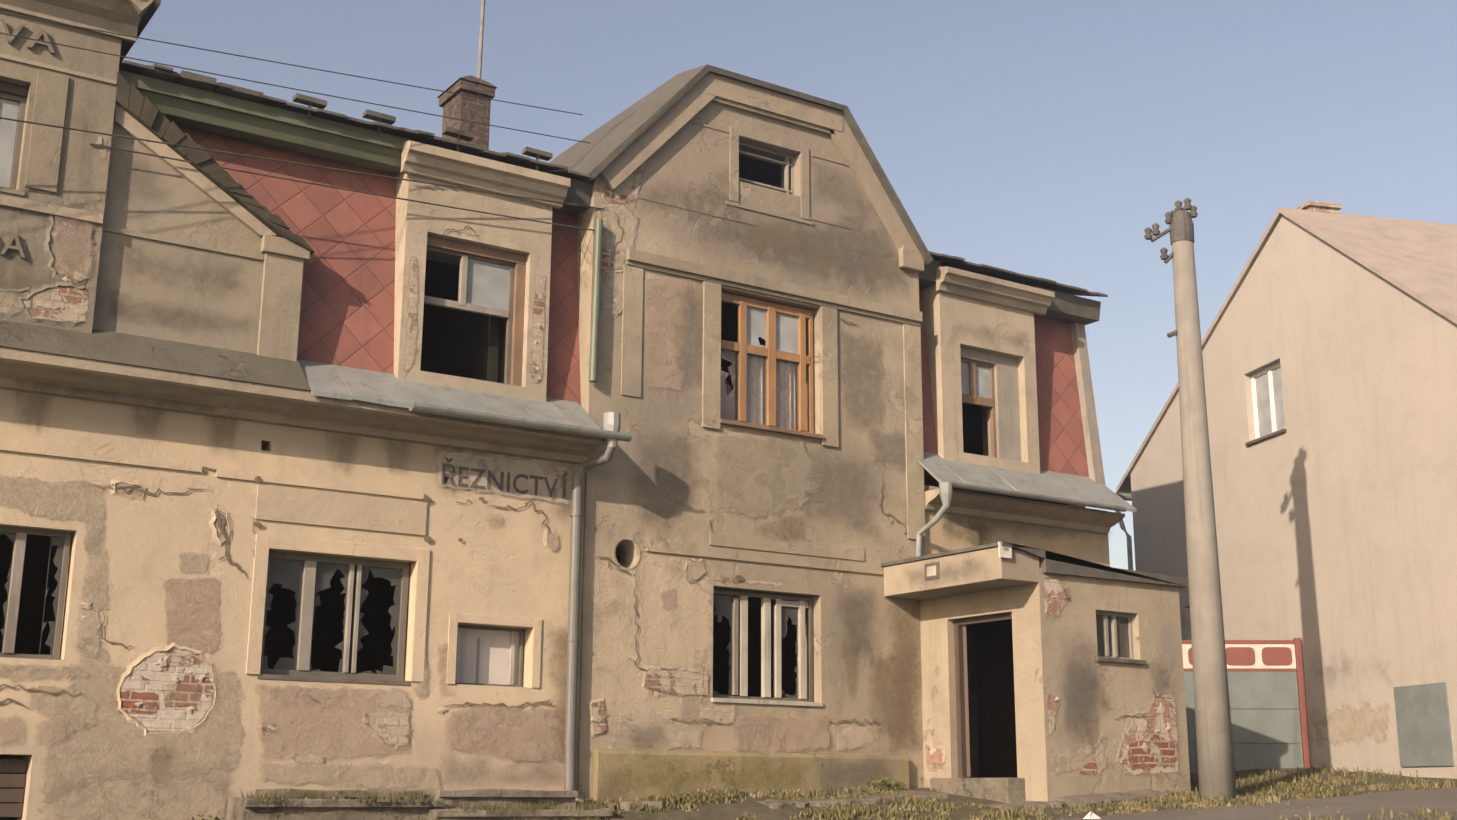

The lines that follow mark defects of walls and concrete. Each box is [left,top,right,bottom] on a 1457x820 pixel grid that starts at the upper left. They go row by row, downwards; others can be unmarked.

flaking render [0,207,97,327]
flaking render [597,149,658,322]
crack [89,466,256,579]
crack [457,499,551,534]
crack [0,684,85,709]
peeling [0,476,277,812]
peeling [259,644,448,790]
crack [598,521,715,678]
peeling [588,664,736,750]
flaking render [1043,574,1072,620]
flaking render [1053,693,1181,779]